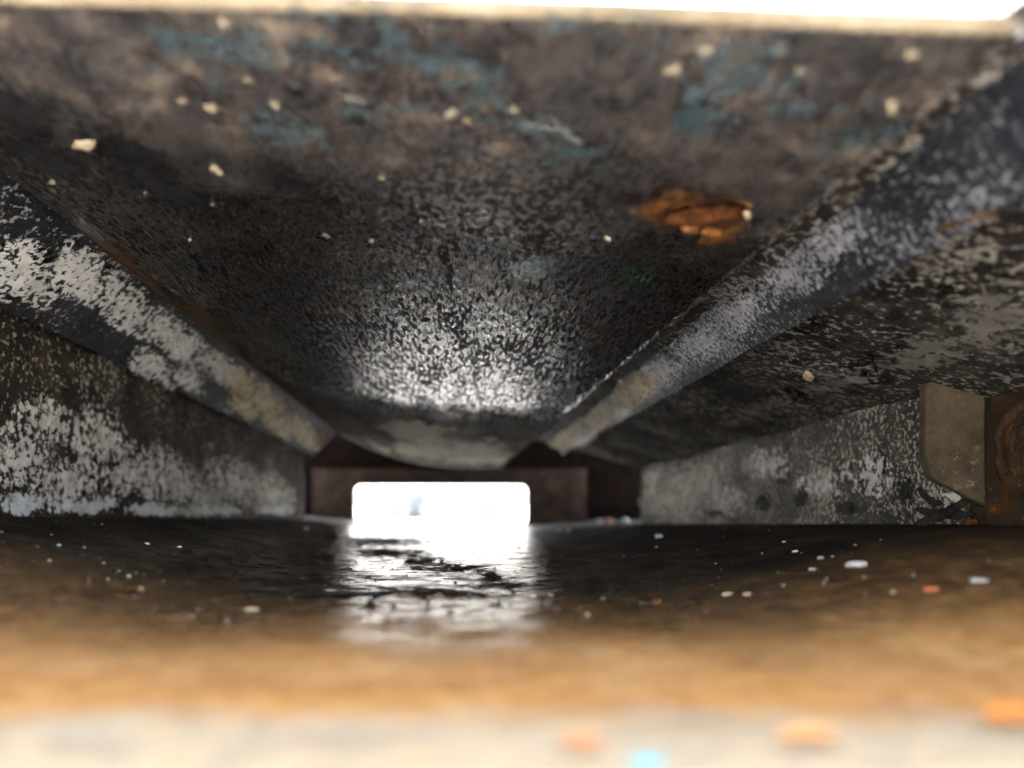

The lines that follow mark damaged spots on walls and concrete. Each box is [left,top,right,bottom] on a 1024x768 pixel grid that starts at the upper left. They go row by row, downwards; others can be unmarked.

damp [0,239,322,451]
damp [0,393,296,518]
damp [638,445,895,519]